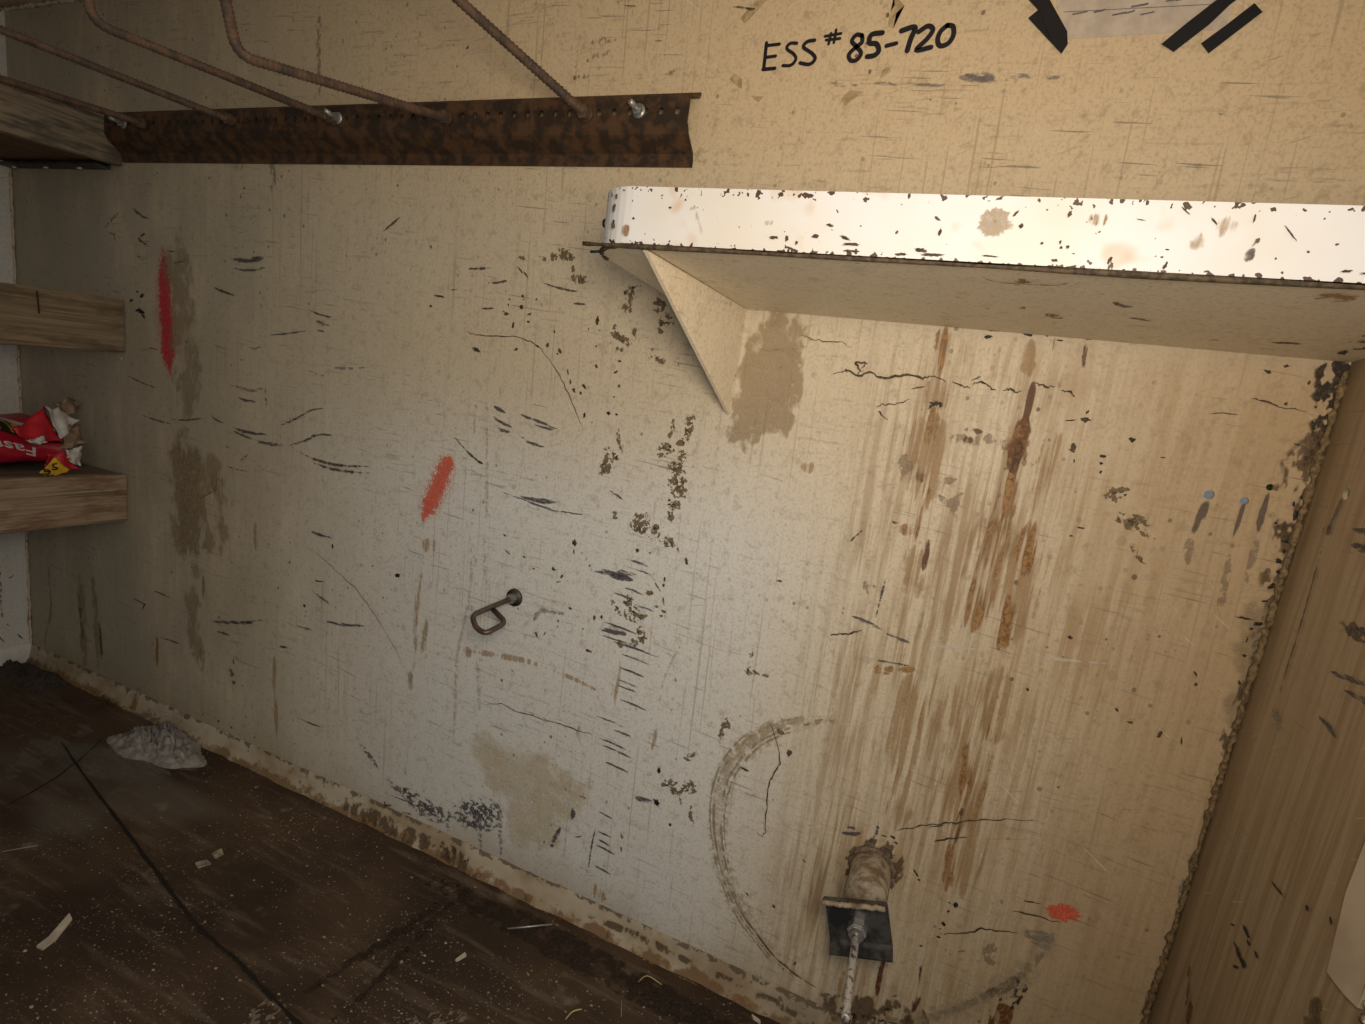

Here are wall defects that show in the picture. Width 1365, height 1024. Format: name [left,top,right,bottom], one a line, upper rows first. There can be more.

rust [901,327,948,593]
rust [965,333,1063,649]
crack [6,737,303,1024]
damp [384,782,502,854]
damp [310,878,731,1024]
damp [588,812,615,874]
damp [597,716,631,772]
damp [709,718,835,985]
damp [842,826,879,842]
rust [812,961,929,1024]
rust [875,660,1011,896]
rust [988,979,1028,1024]